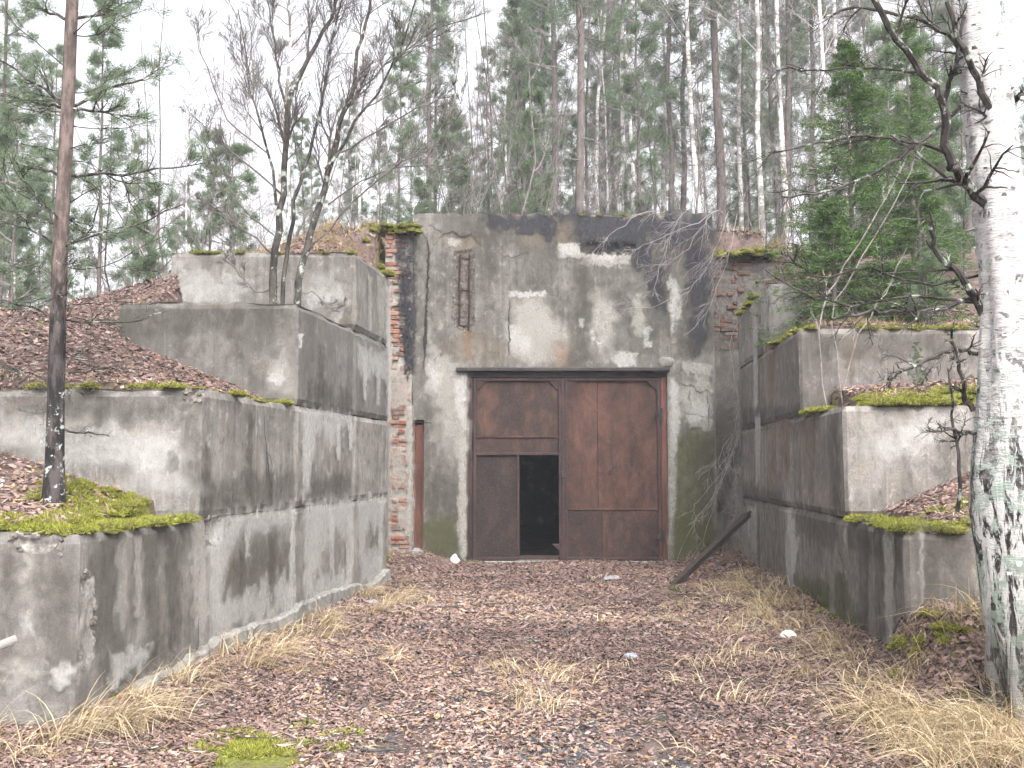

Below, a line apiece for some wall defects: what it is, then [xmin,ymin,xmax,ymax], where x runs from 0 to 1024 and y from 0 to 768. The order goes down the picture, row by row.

spalling [449,241,477,333]
crack [422,226,530,370]
water stain [485,208,717,357]
peeling [389,369,413,535]
crack [678,381,711,426]
water stain [193,496,382,627]